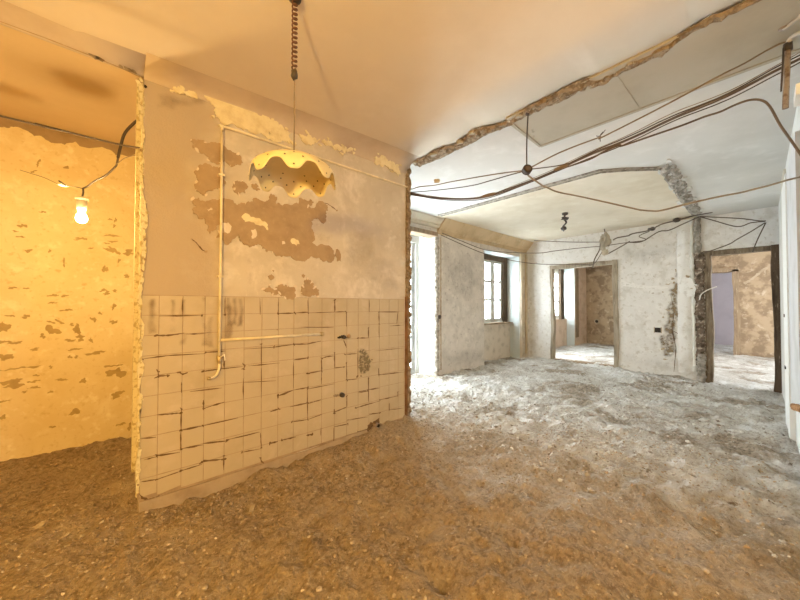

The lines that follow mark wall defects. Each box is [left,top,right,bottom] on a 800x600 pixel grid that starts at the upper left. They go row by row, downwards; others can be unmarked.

peeling [170,85,356,156]
peeling [190,139,342,263]
spalling [374,0,762,417]
spalling [0,78,149,498]
peeling [261,270,319,300]
crack [140,298,401,500]
spalling [355,345,373,378]